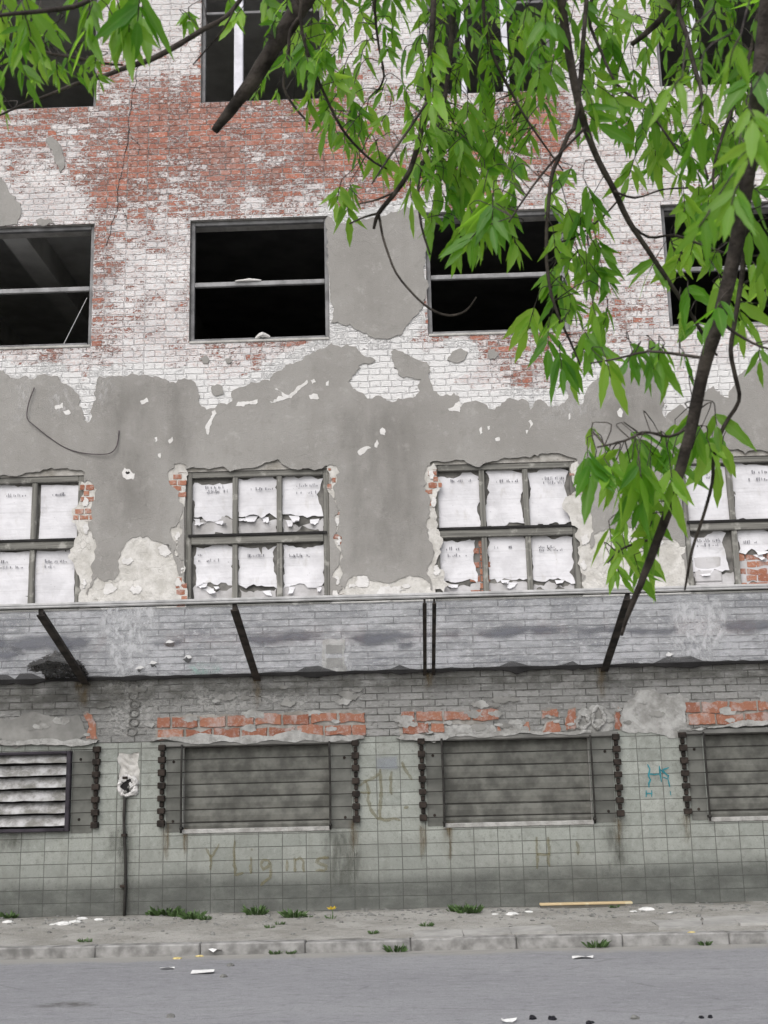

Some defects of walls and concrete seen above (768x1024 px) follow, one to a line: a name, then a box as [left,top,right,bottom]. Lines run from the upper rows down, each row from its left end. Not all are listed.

crack [106,67,140,246]
flaking render [0,178,22,227]
flaking render [325,207,429,339]
flaking render [211,384,224,396]
flaking render [236,379,329,407]
flaking render [447,348,467,363]
flaking render [68,463,188,609]
flaking render [327,463,450,603]
flaking render [0,661,367,749]
peeling [393,689,768,738]